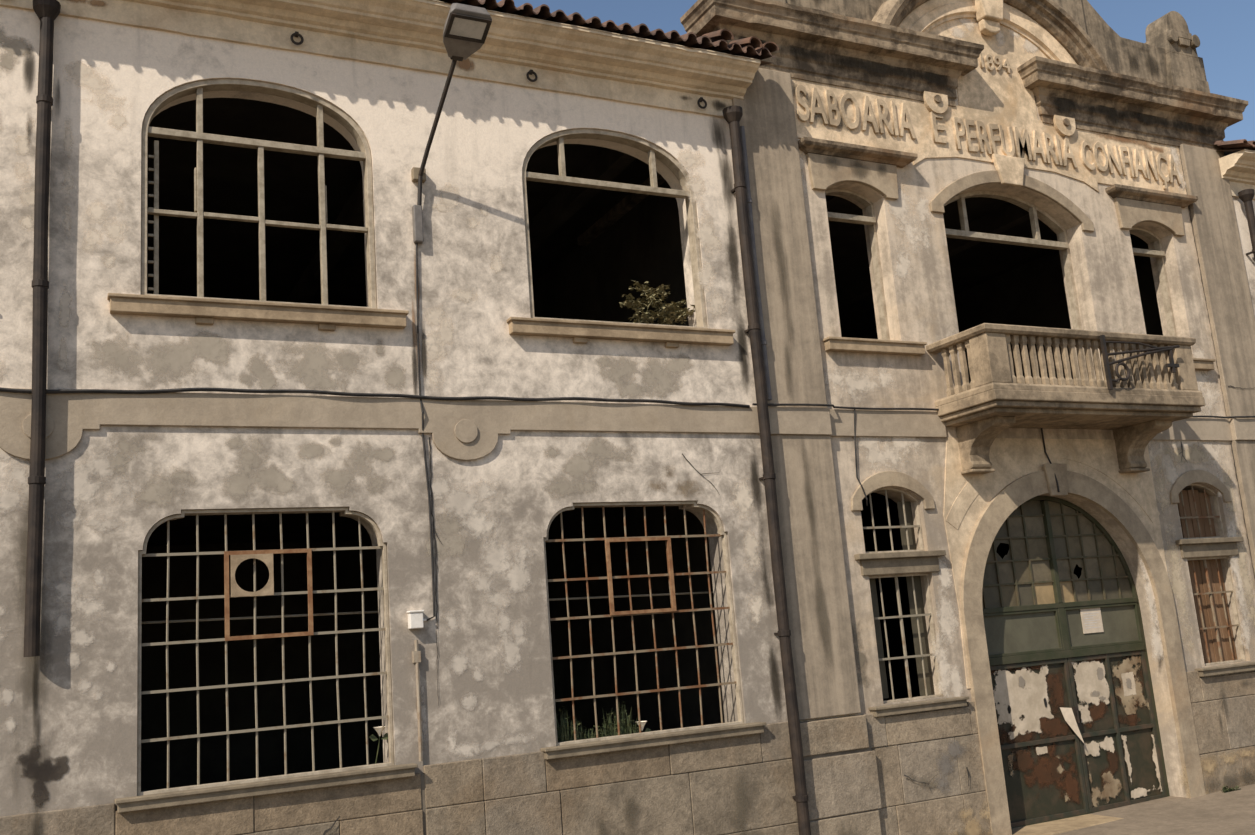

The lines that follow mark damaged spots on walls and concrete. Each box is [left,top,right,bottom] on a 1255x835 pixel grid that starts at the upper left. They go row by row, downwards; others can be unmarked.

water stain [24,55,33,87]
water stain [714,126,732,201]
water stain [729,228,738,284]
water stain [738,326,747,380]
peeling [932,560,963,697]
peeling [1141,559,1163,659]
water stain [18,656,69,835]